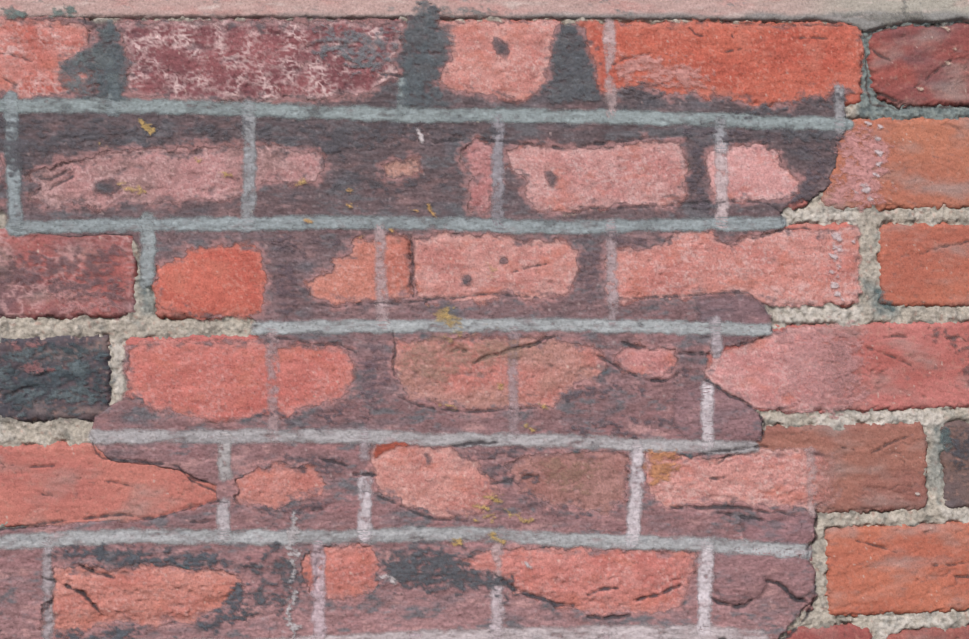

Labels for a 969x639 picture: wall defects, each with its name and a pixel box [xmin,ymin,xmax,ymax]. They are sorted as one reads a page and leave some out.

spalling [0,16,101,100]
spalling [114,17,404,103]
spalling [437,18,560,101]
spalling [575,19,864,108]
spalling [29,144,325,210]
spalling [507,141,688,213]
spalling [306,231,579,308]
spalling [604,225,862,308]
spalling [124,338,355,423]
spalling [641,447,832,510]
spalling [39,563,244,638]
spalling [459,545,697,616]